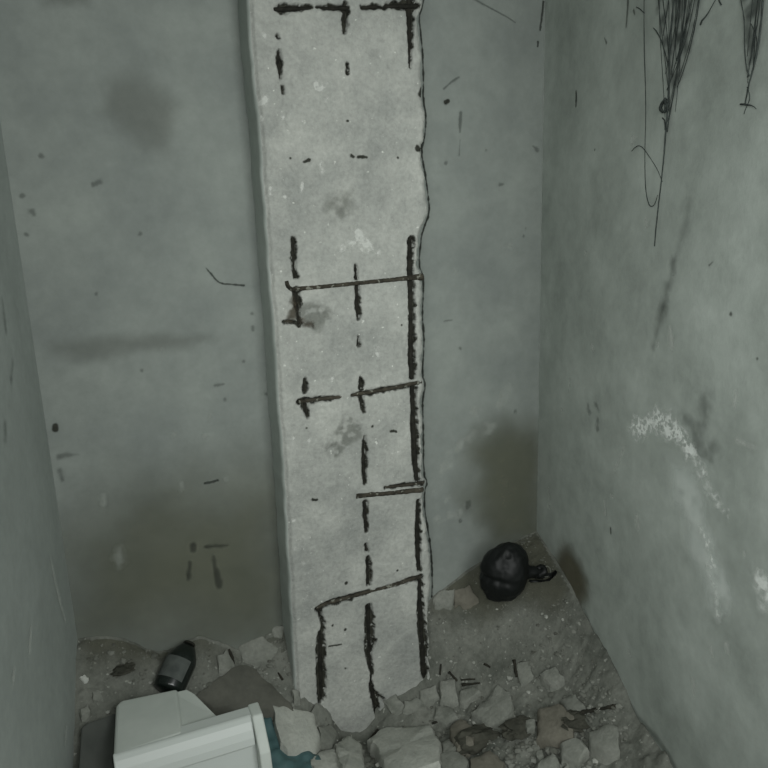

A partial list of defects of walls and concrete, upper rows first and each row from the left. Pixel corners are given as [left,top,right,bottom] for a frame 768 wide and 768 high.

spalling [276,0,350,34]
spalling [360,0,420,62]
spalling [282,236,303,328]
rust [287,298,313,327]
spalling [296,378,334,417]
spalling [351,235,425,489]
leakage [631,409,728,617]
spalling [314,555,385,709]
spalling [405,503,430,675]